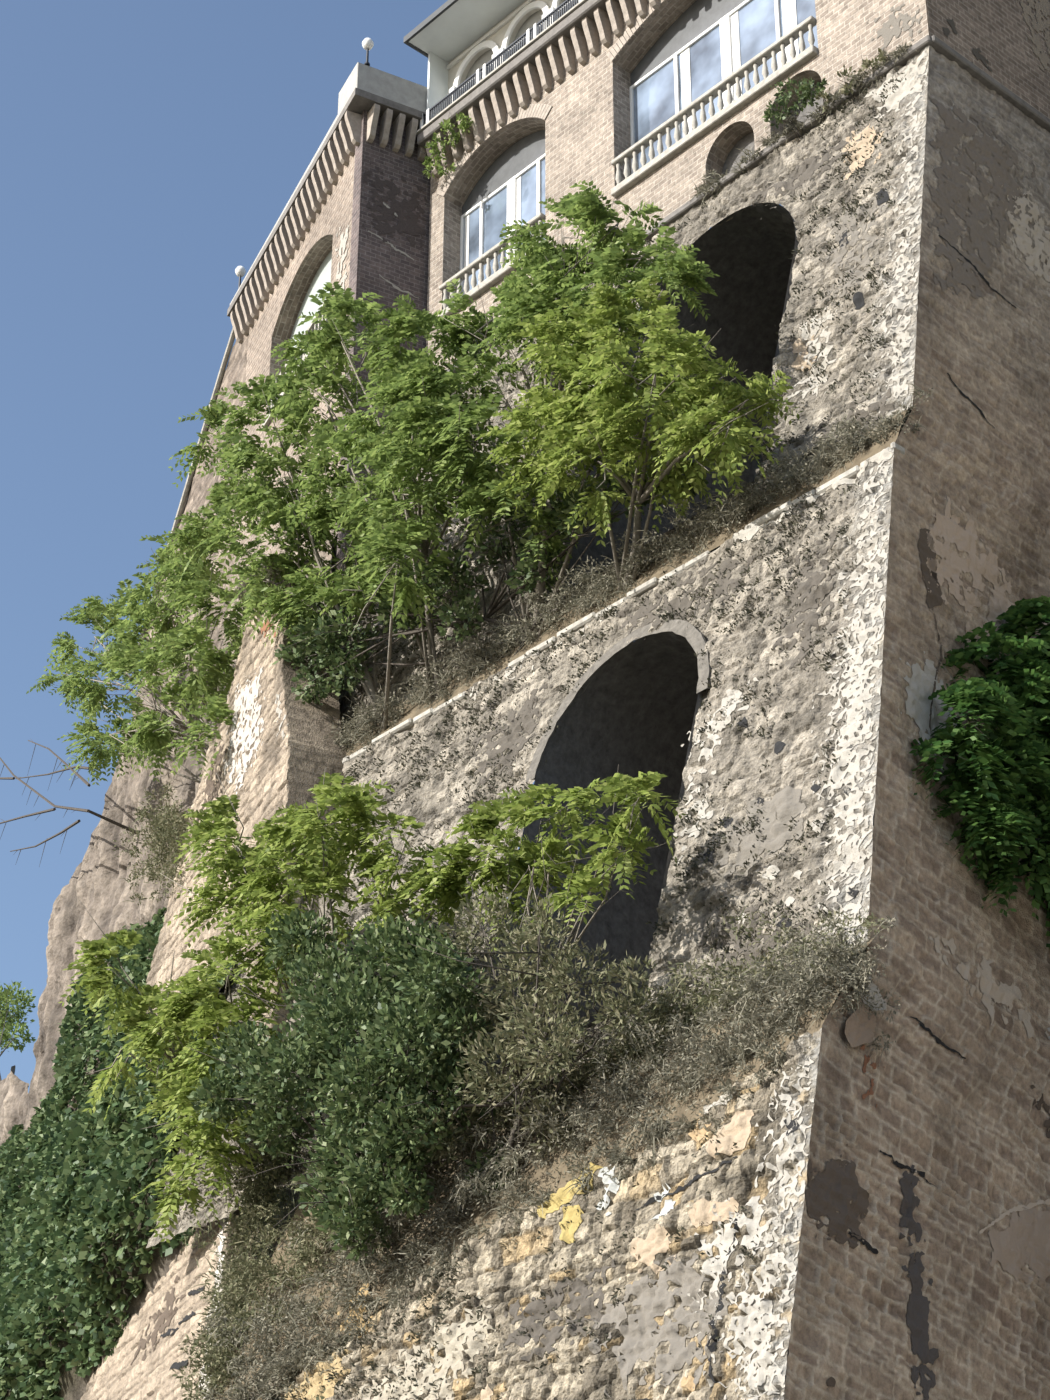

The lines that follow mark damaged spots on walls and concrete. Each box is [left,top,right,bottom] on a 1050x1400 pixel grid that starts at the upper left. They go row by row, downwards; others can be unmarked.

crack [880,1150,935,1186]